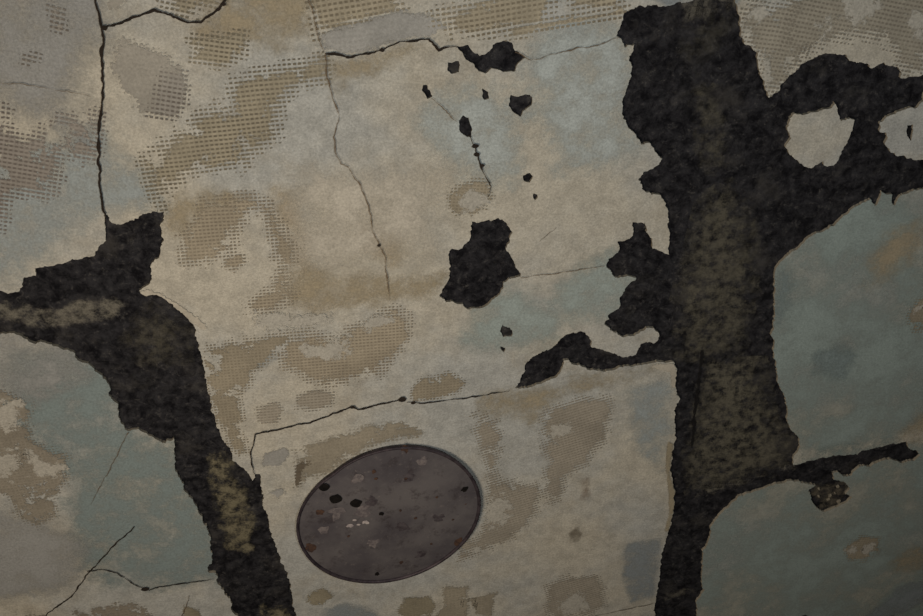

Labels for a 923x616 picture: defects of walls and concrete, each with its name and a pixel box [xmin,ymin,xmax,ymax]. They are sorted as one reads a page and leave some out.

crack [7,0,226,222]
peeling [109,36,192,121]
peeling [156,0,228,23]
peeling [185,28,250,71]
crack [308,0,456,301]
crack [438,104,491,197]
crack [515,38,615,60]
spalling [0,51,422,616]
crack [521,266,602,278]
spalling [305,0,923,616]
crack [250,391,509,474]